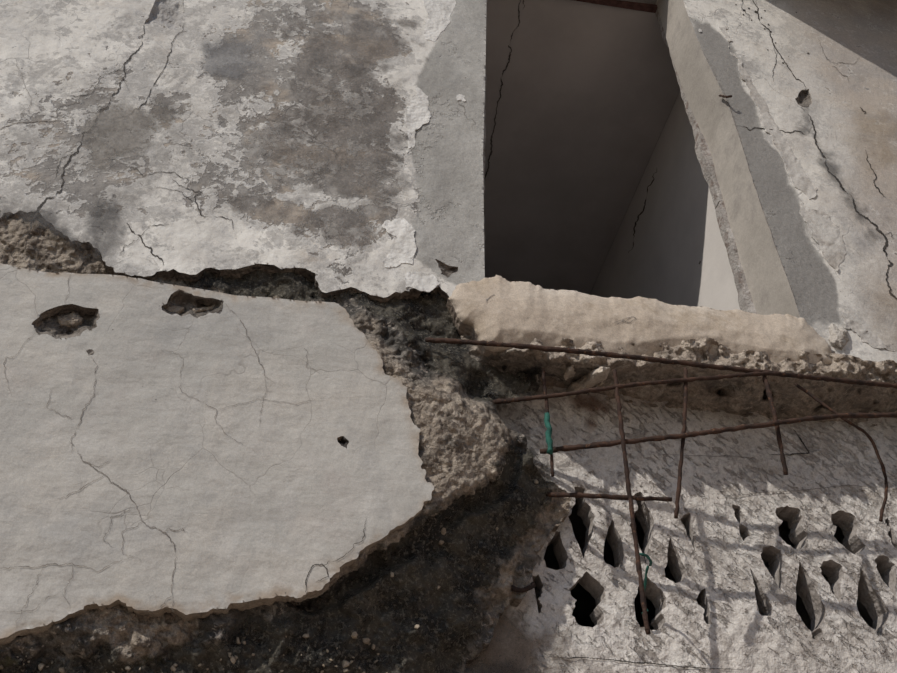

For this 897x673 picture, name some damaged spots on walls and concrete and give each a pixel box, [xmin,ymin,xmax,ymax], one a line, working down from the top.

crack [0,27,145,265]
peeling [404,85,431,154]
peeling [719,27,846,271]
crack [704,0,897,301]
crack [129,166,233,226]
crack [121,223,169,264]
peeling [382,218,458,292]
spalling [33,309,100,339]
spalling [162,289,224,318]
crack [2,360,187,626]
spalling [425,337,897,635]
crack [534,654,741,670]